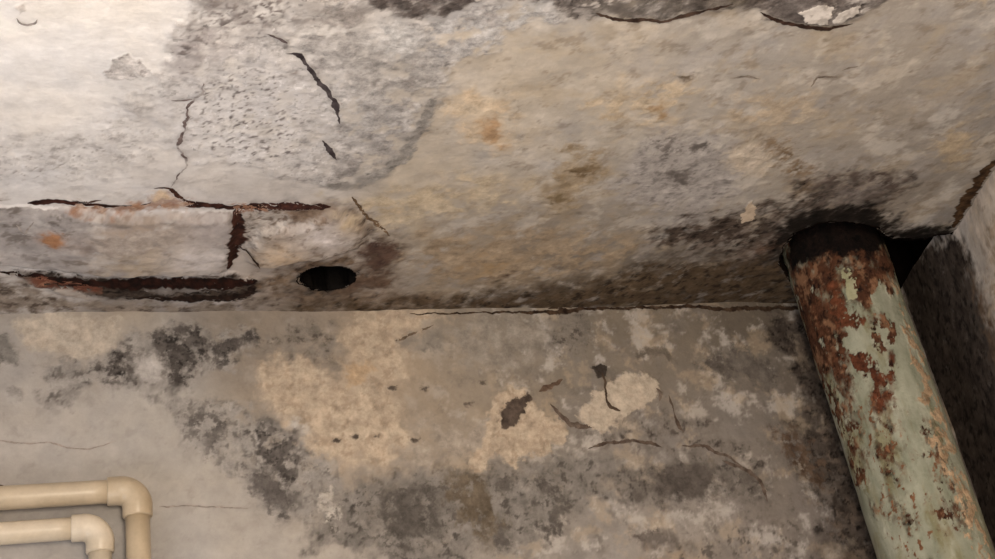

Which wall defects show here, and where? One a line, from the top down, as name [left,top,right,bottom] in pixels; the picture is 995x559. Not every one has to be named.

rust [50,185,210,227]
crack [0,83,331,304]
rust [222,200,273,217]
crack [266,34,341,160]
peeling [0,0,900,257]
crack [950,143,995,228]
peeling [237,308,474,486]
water stain [0,78,877,559]
peeling [450,360,684,476]
crack [410,303,799,316]
water stain [535,61,995,548]
rust [783,222,995,559]